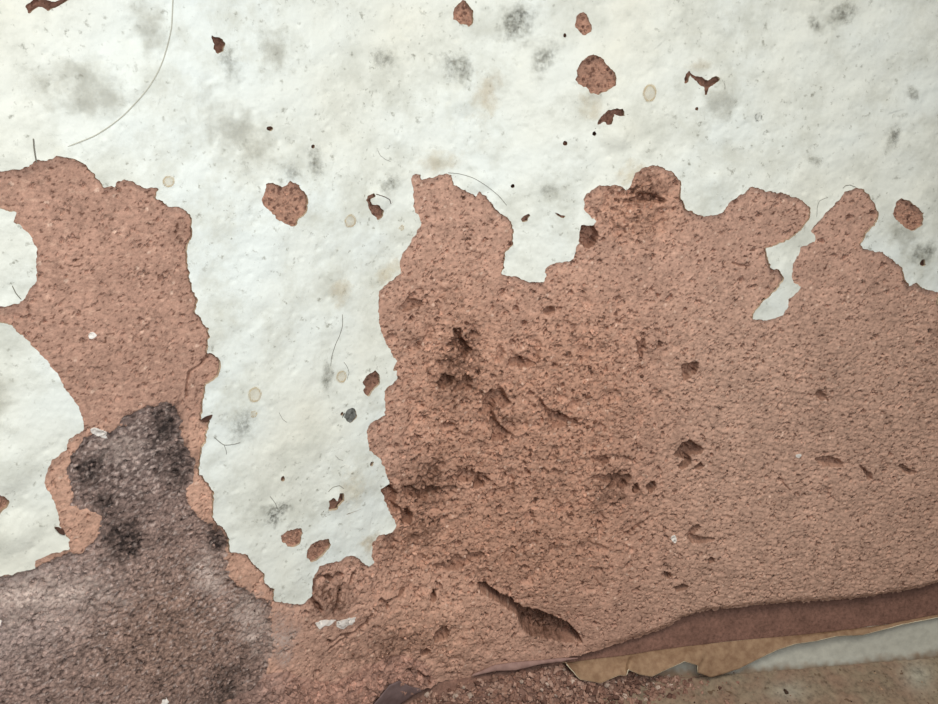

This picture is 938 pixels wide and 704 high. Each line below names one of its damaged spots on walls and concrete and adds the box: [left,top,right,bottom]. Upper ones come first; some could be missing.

peeling [450,0,476,31]
peeling [572,8,595,38]
peeling [572,50,619,97]
peeling [593,105,628,128]
water stain [154,410,175,440]
flaking render [0,150,938,704]
water stain [77,456,103,482]
water stain [104,522,142,556]
water stain [193,525,229,594]
water stain [0,570,111,628]
water stain [233,595,294,664]